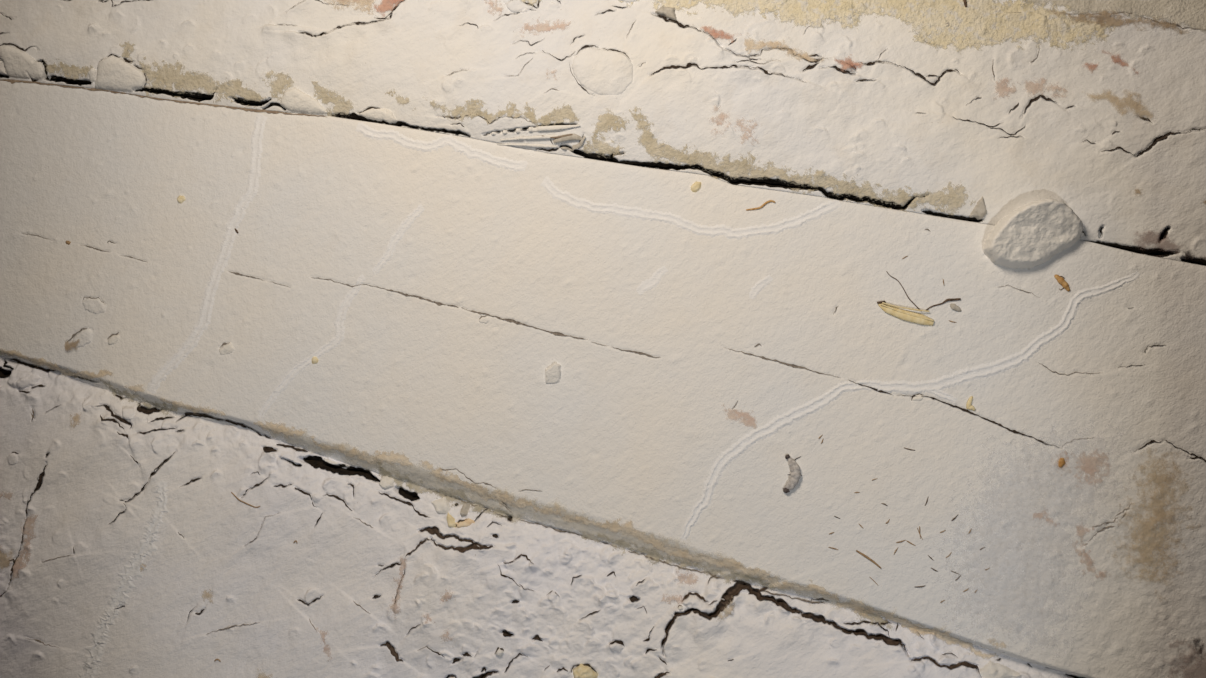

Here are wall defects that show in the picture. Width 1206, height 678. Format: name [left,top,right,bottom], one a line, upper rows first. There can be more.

peeling [654,0,1206,51]
peeling [46,57,93,80]
crack [99,54,147,88]
peeling [121,42,294,108]
peeling [312,81,353,119]
peeling [430,99,579,127]
crack [356,107,841,240]
peeling [583,108,972,215]
crack [30,113,267,678]
crack [243,271,1163,678]
crack [1137,440,1206,462]
crack [0,452,75,597]